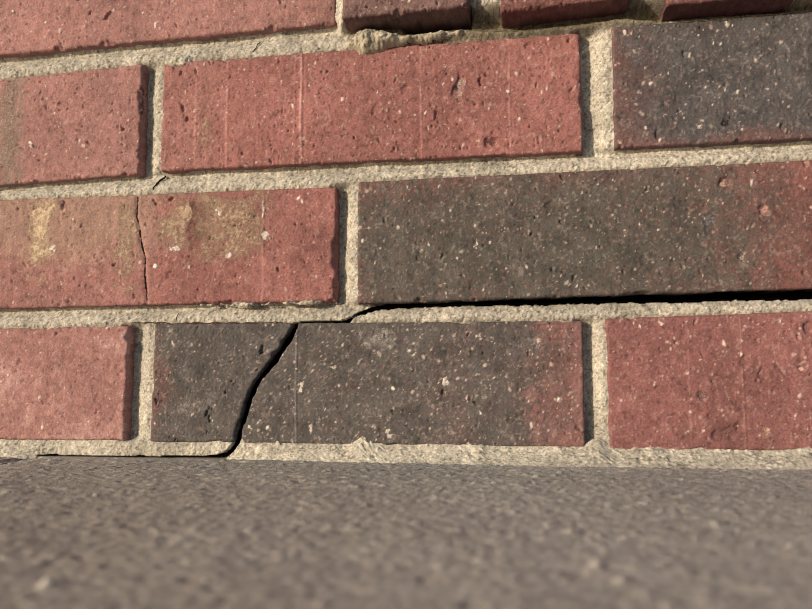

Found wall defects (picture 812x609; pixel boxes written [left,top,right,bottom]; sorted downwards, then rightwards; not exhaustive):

crack [132,175,298,456]
crack [318,290,812,323]